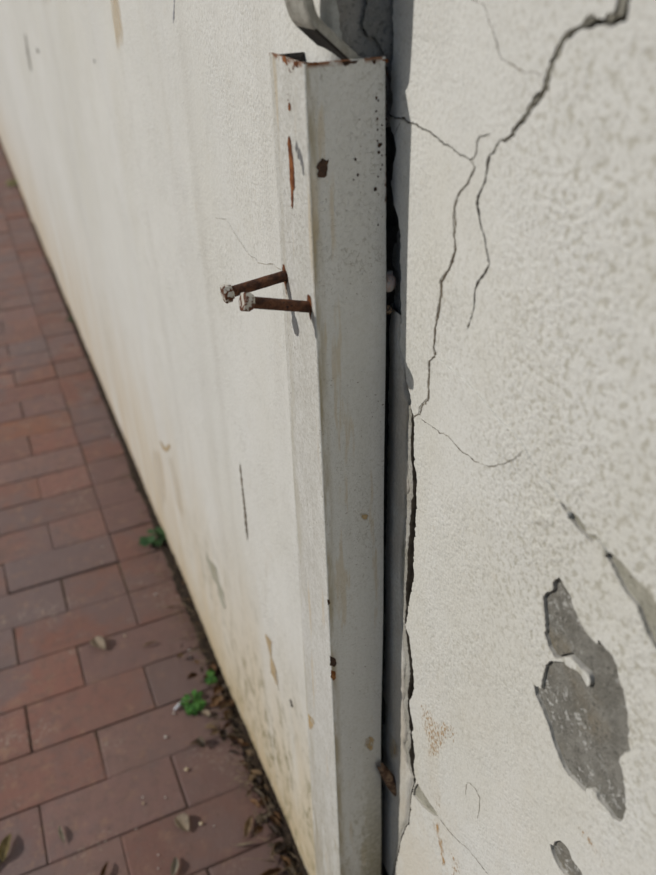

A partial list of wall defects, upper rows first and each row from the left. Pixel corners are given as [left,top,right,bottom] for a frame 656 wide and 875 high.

flaking render [336,0,394,127]
rust [317,158,329,178]
crack [388,0,630,875]
peeling [560,502,656,650]
peeling [534,578,630,820]
peeling [549,840,582,875]